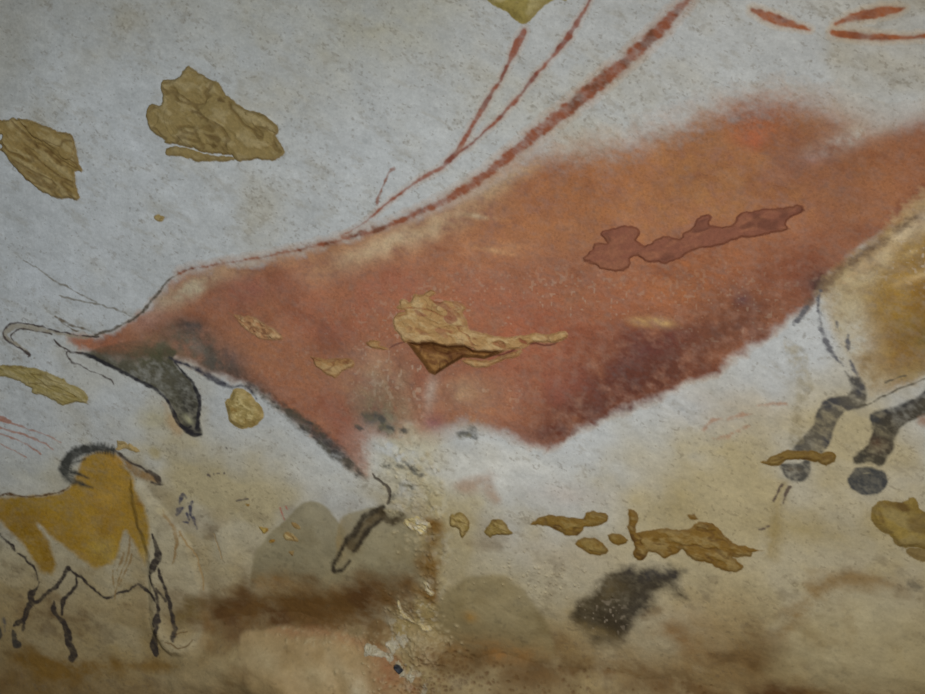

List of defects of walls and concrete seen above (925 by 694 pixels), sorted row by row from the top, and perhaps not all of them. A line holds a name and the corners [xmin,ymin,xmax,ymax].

peeling [486,0,568,25]
peeling [146,65,286,163]
peeling [0,117,84,201]
spalling [392,289,569,376]
peeling [0,364,89,406]
peeling [224,387,265,430]
peeling [760,448,837,467]
damp [402,515,432,537]
peeling [530,508,765,573]
peeling [870,496,925,563]
damp [397,599,433,632]
damp [363,631,416,684]